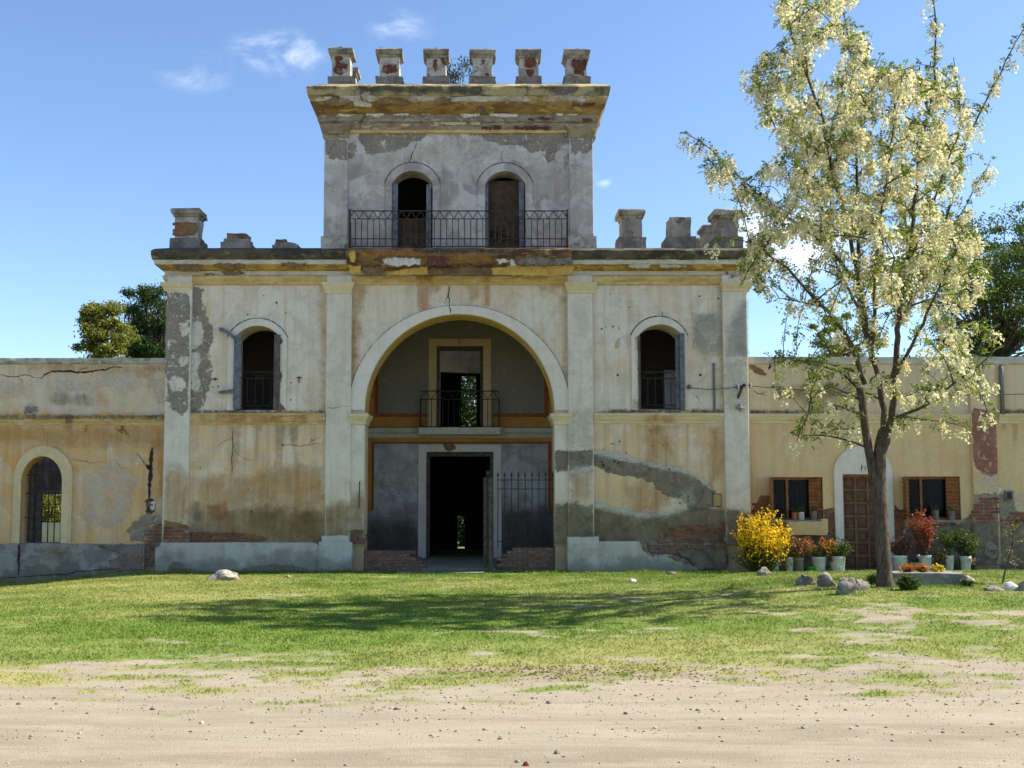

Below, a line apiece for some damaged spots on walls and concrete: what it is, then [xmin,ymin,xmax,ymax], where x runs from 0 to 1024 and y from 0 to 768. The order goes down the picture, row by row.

spalling [333,56,347,75]
spalling [381,64,397,73]
spalling [524,58,537,76]
spalling [572,59,588,76]
peeling [323,96,595,168]
peeling [348,251,574,277]
crack [7,366,123,381]
peeling [164,287,219,416]
peeling [555,441,716,512]
peeling [894,408,1024,570]
peeling [99,500,265,572]
spalling [640,523,728,571]